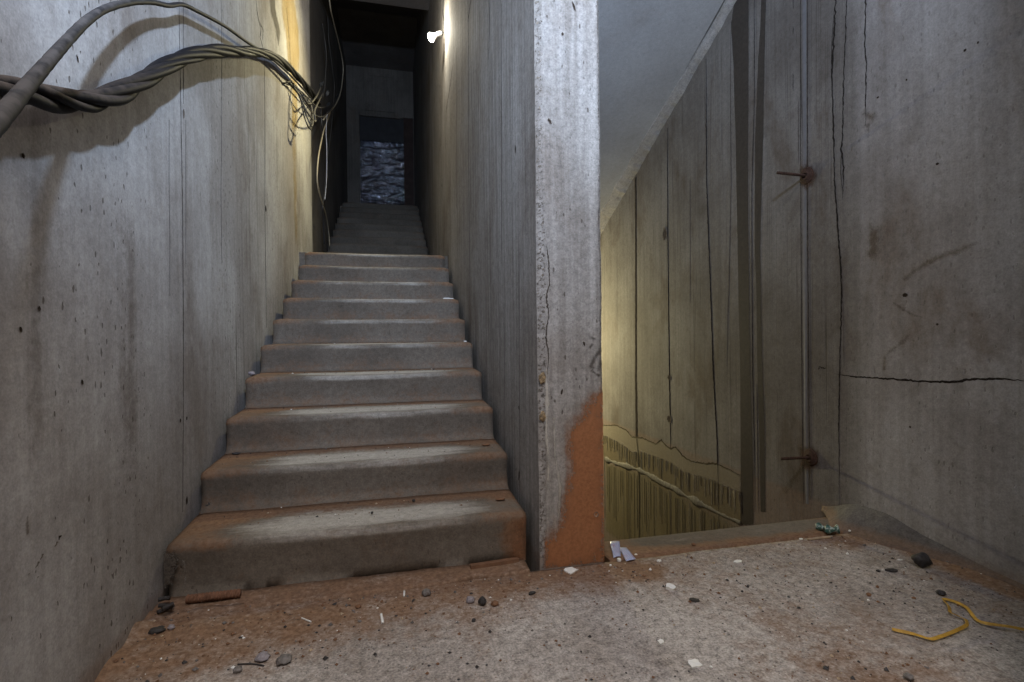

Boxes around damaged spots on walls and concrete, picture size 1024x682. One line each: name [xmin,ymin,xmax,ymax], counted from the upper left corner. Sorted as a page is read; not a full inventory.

crack [543,240,551,373]
crack [831,0,1022,475]